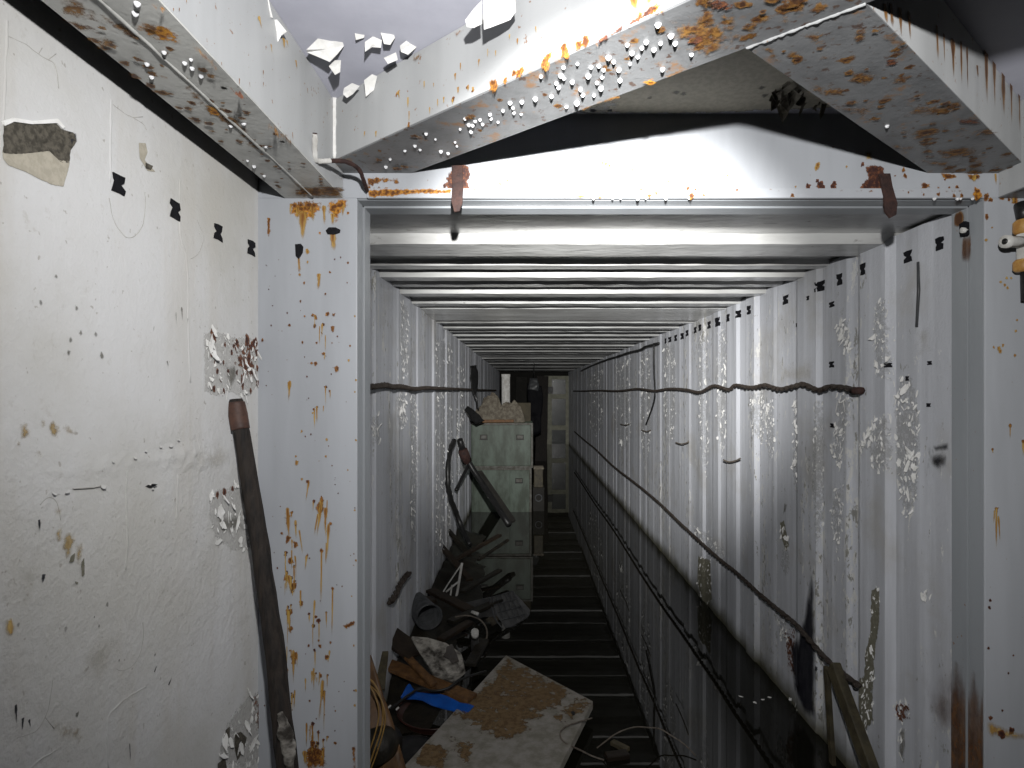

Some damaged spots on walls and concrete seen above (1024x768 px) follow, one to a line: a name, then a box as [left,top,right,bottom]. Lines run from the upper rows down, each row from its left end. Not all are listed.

corrosion [64,0,305,188]
peeling [307,39,344,75]
peeling [343,74,377,98]
peeling [355,33,416,64]
spalling [1,118,76,186]
corrosion [368,165,470,197]
corrosion [860,153,907,191]
corrosion [290,176,349,295]
peeling [206,324,262,403]
peeling [859,298,921,518]
corrosion [272,478,352,768]
corrosion [942,684,1016,768]